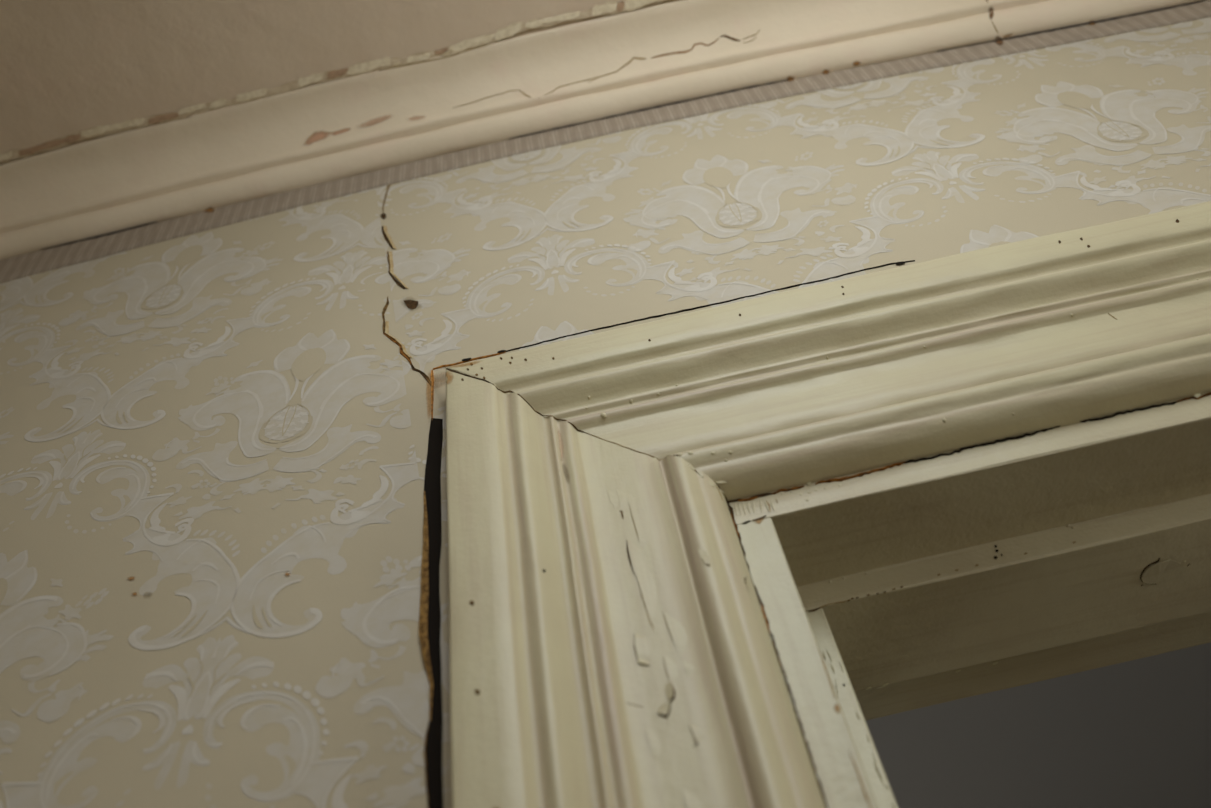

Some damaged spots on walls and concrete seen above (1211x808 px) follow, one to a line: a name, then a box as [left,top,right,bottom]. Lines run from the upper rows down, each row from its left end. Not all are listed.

flaking render [0,0,678,165]
crack [453,30,760,108]
crack [381,184,915,459]
crack [727,392,1211,808]